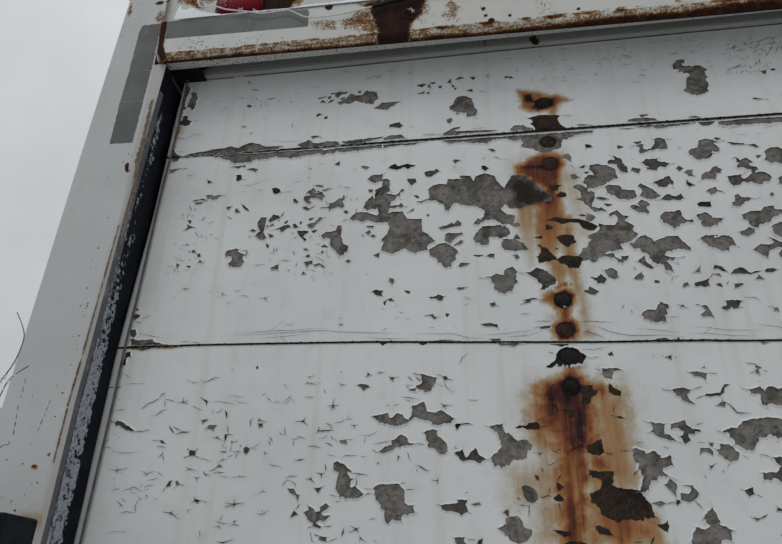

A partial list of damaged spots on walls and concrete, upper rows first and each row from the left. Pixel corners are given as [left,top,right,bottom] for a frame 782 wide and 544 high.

corrosion [155,0,782,64]
peeling [169,77,595,182]
corrosion [517,89,570,115]
peeling [249,114,782,319]
corrosion [513,151,592,341]
crack [107,369,438,543]
peeling [287,459,418,543]
peeling [370,373,540,471]
corrosion [516,365,666,544]
peeling [583,446,701,536]
peeling [642,365,782,464]
peeling [688,500,737,544]